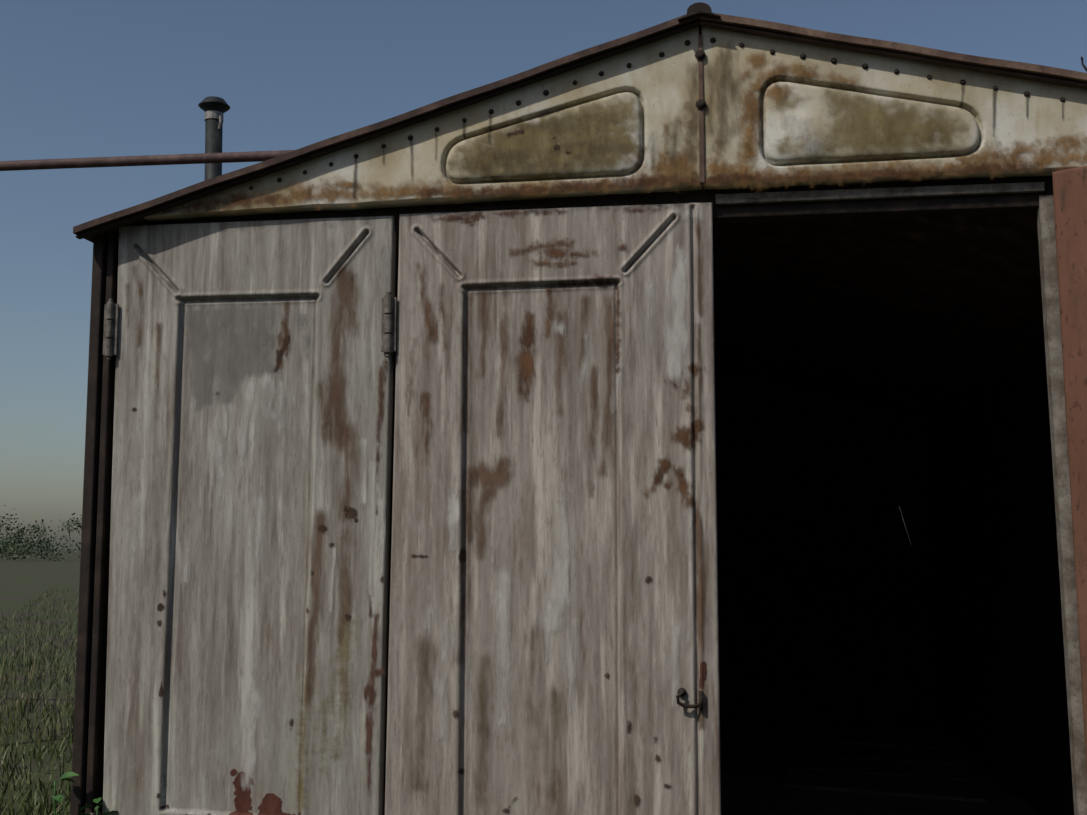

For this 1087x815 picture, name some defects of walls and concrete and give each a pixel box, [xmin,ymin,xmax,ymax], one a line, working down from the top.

water stain [458,98,640,180]
corrosion [162,54,1087,213]
water stain [825,85,965,156]
corrosion [320,268,358,538]
corrosion [376,361,388,470]
corrosion [500,276,620,445]
corrosion [669,327,702,449]
corrosion [305,513,334,700]
corrosion [467,459,509,548]
corrosion [646,459,705,664]
peeling [156,687,301,815]
corrosion [364,607,385,789]